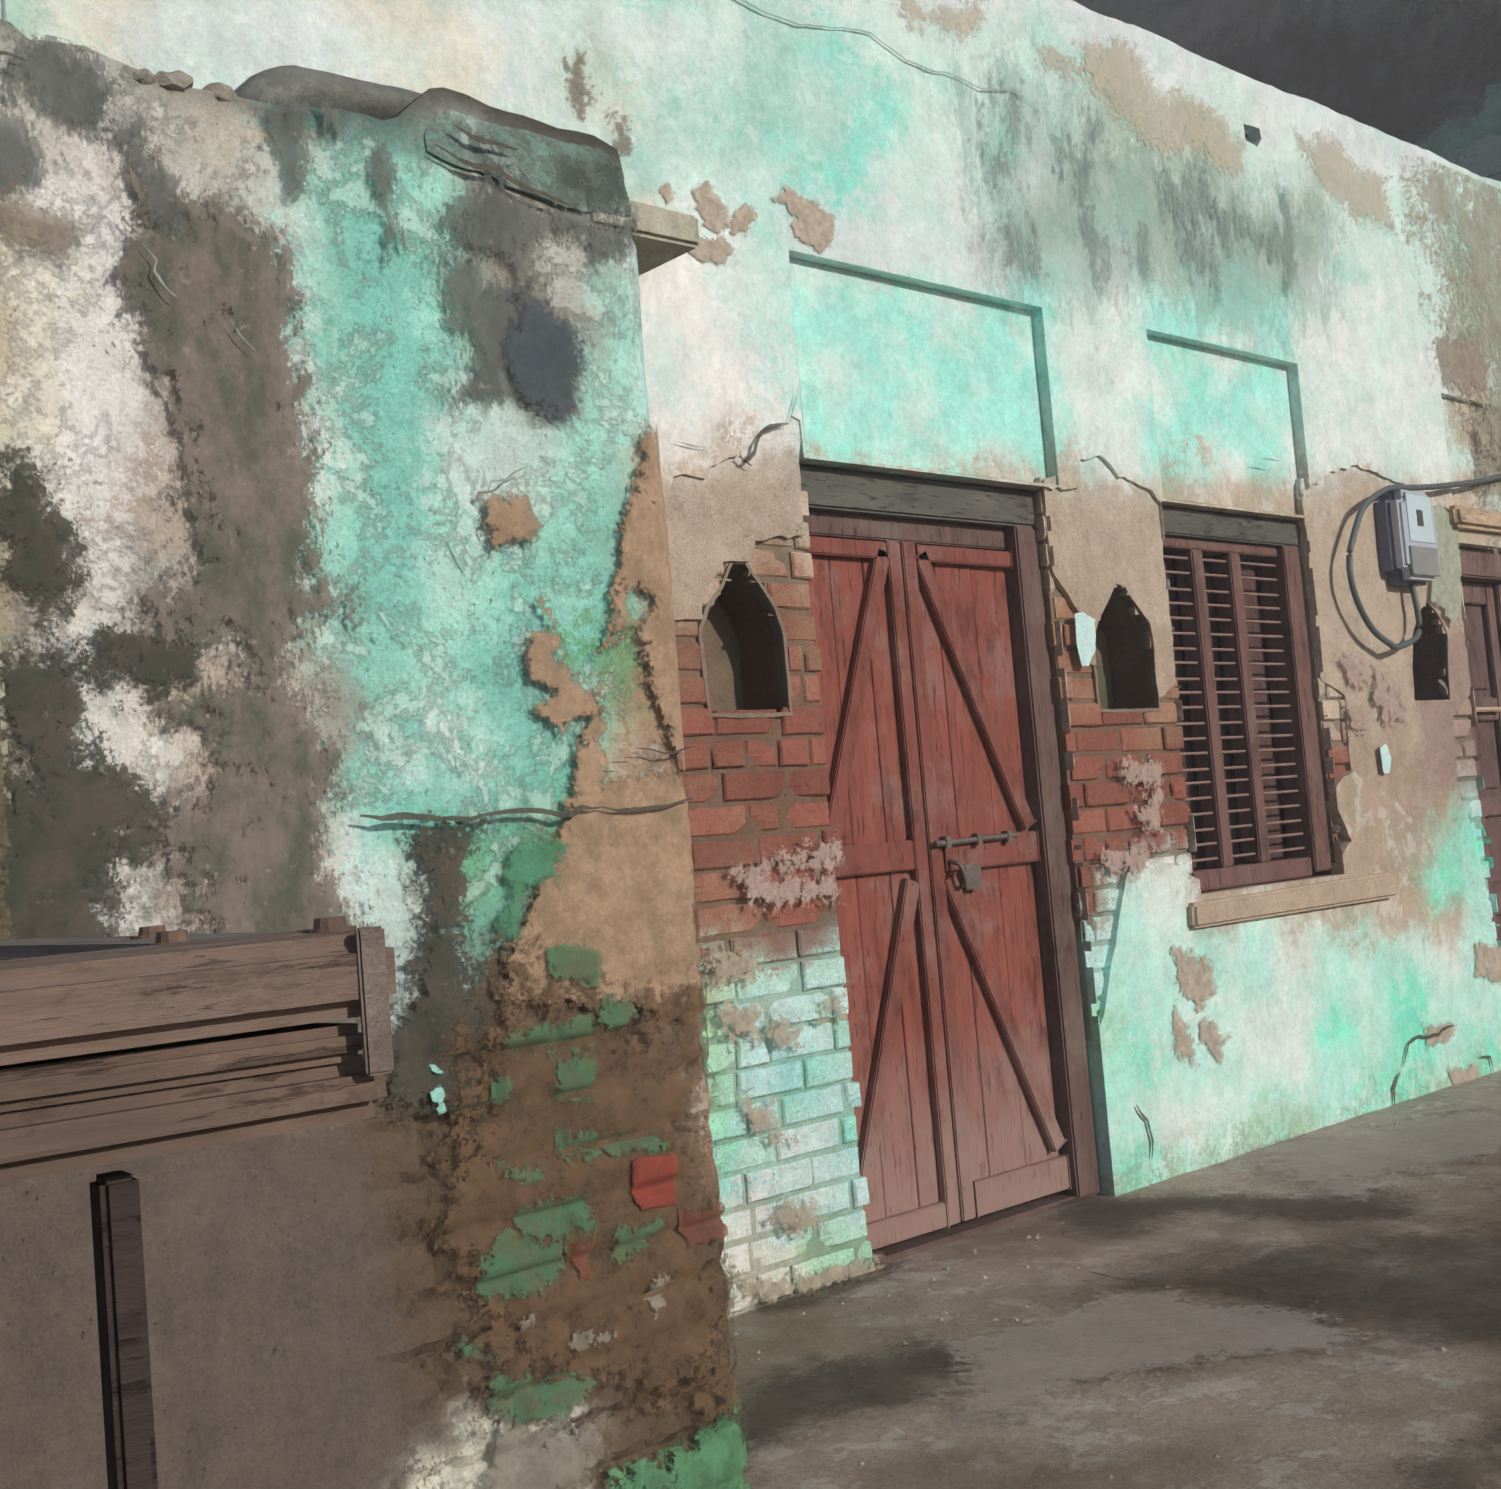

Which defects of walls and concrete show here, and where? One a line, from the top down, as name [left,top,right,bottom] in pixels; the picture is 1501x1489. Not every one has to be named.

crack [741,0,1050,113]
damp [0,34,375,940]
damp [364,139,642,408]
flaking render [1290,124,1501,523]
crack [360,798,693,822]
crack [612,746,695,763]
damp [375,801,971,1481]
flaking render [475,417,886,1331]
flaking render [1034,456,1193,1042]
damp [1048,1192,1501,1345]
flaking render [1293,466,1501,985]
crack [1392,1025,1454,1105]